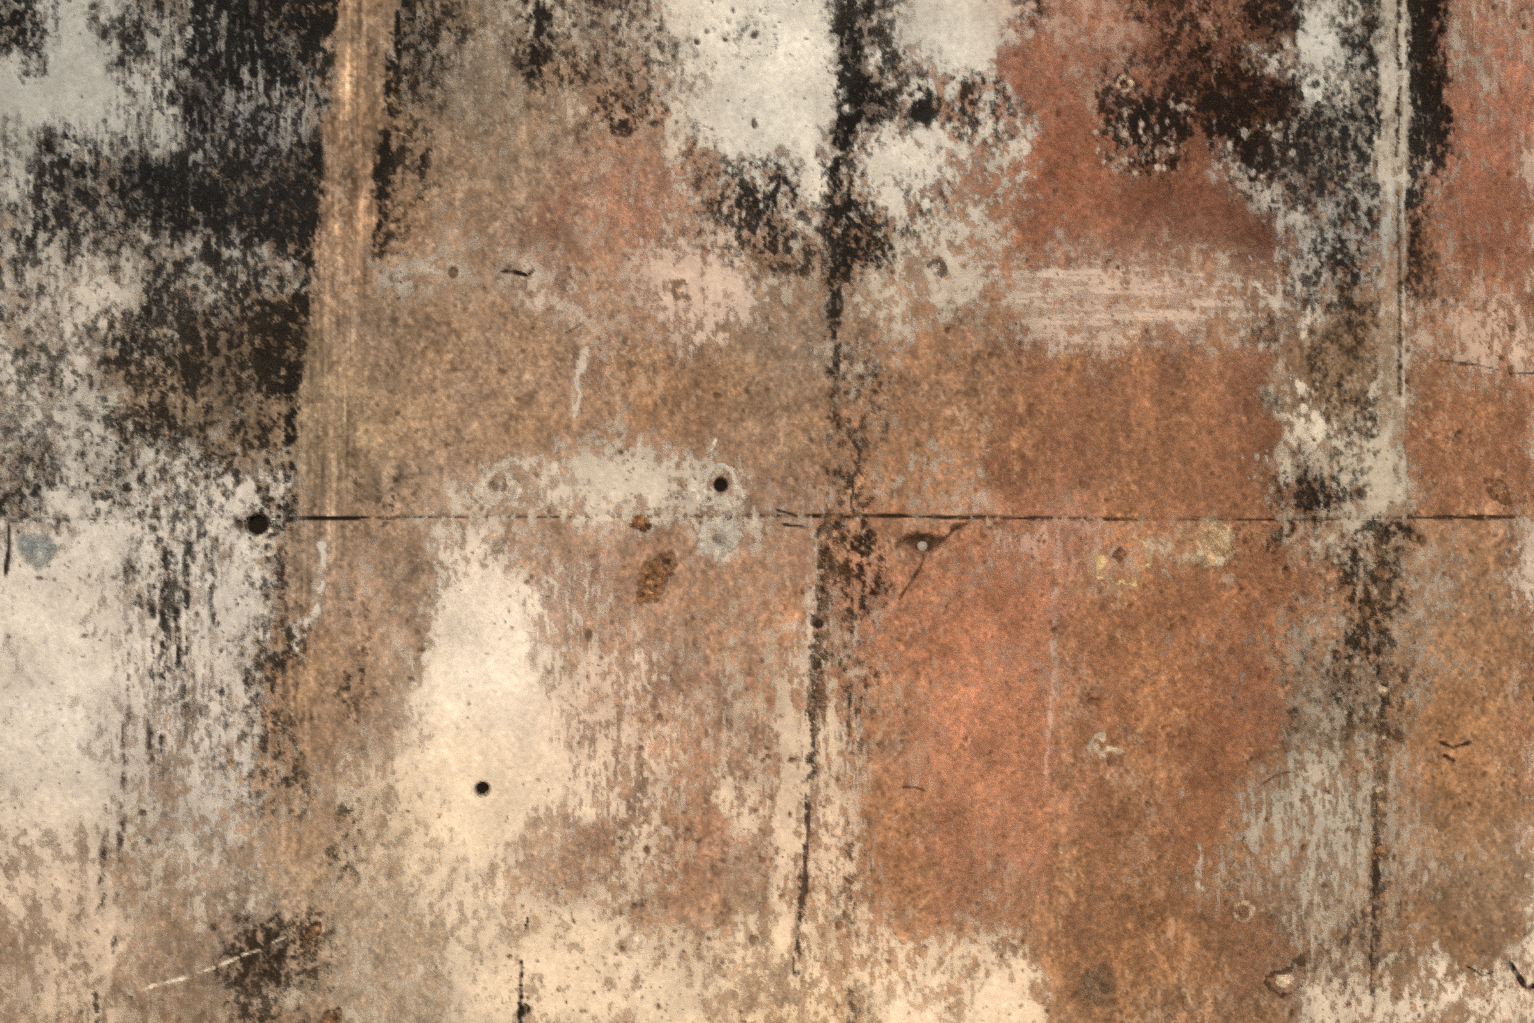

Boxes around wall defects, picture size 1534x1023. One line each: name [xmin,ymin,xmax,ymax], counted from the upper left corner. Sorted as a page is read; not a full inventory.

water stain [98,804,125,908]
water stain [0,0,340,817]
water stain [505,0,1028,823]
water stain [793,844,809,974]
corrosion [862,0,1300,1023]
water stain [1095,0,1383,551]
crack [1238,513,1531,521]
crack [1440,741,1471,762]